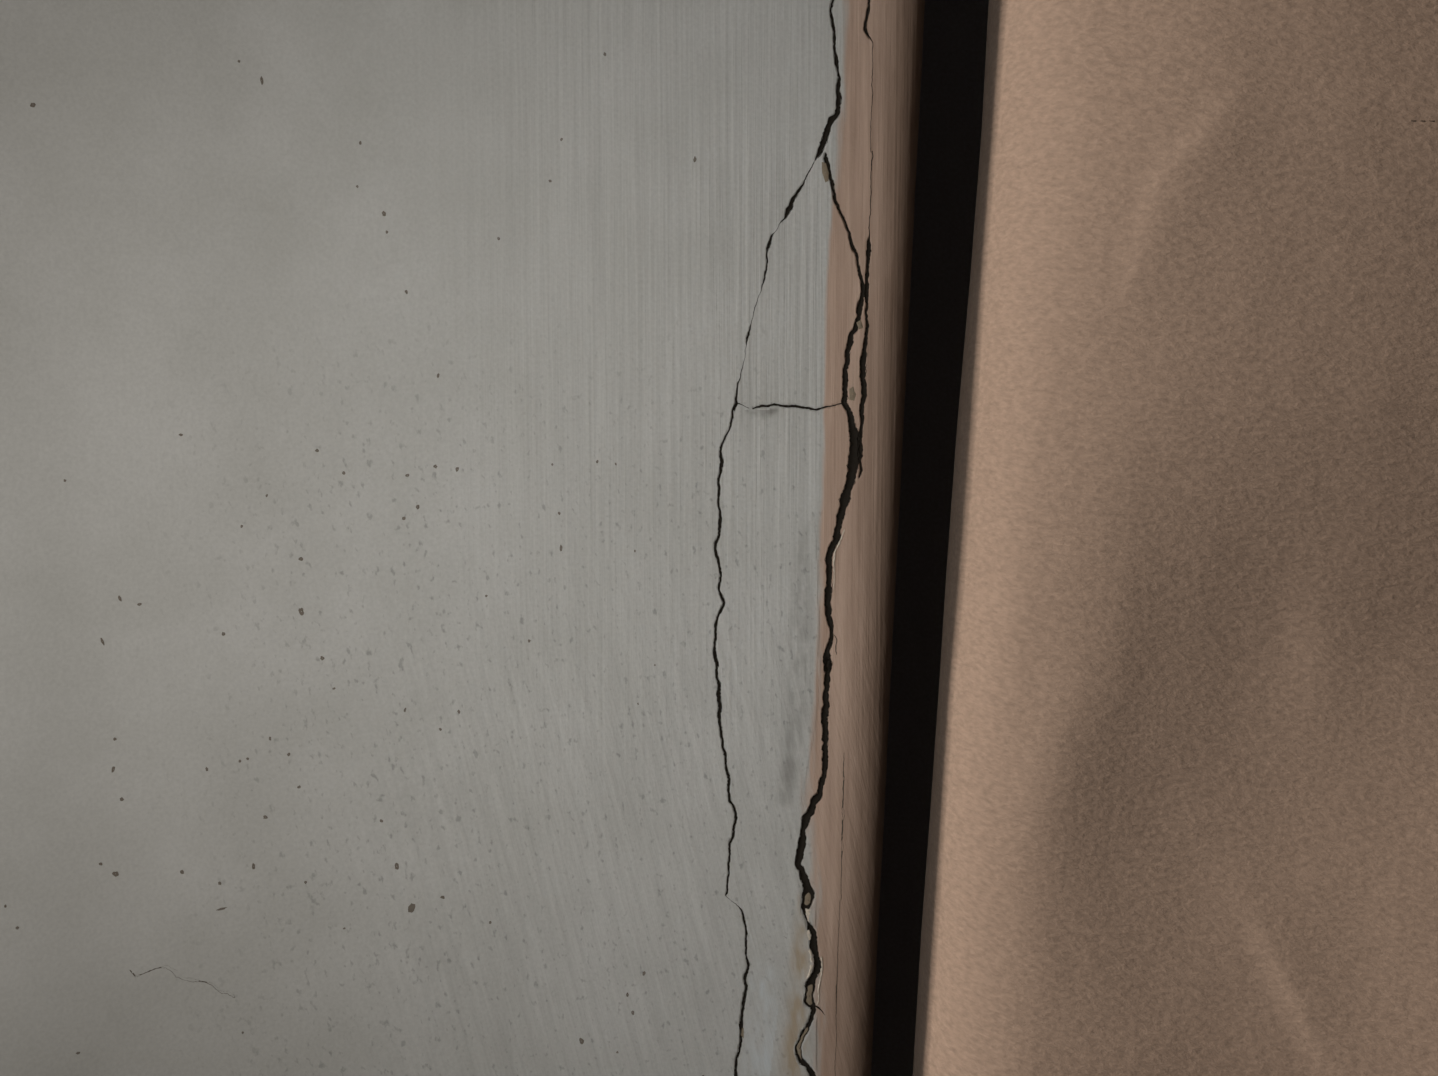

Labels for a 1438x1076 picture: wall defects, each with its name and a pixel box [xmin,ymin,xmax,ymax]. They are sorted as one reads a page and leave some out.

crack [713,0,873,1076]